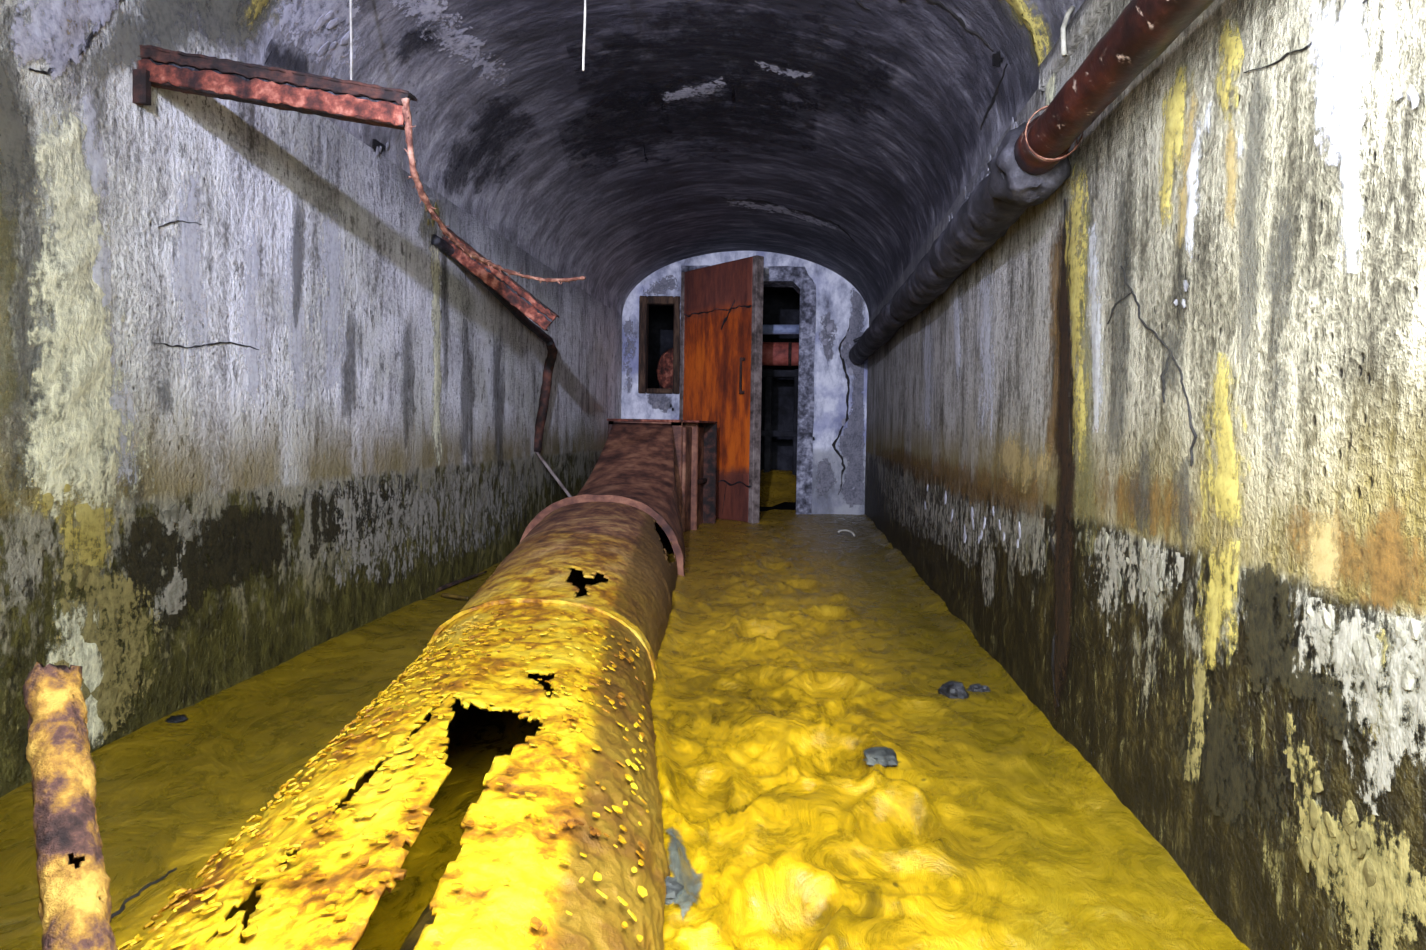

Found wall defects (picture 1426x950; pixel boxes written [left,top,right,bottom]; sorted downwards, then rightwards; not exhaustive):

crack [157,220,202,228]
crack [156,342,259,350]
rust [880,199,1076,719]
crack [1107,266,1198,466]
crack [1243,41,1315,73]
water stain [1309,0,1371,272]
water stain [1169,352,1361,850]
peeling [1283,590,1426,950]